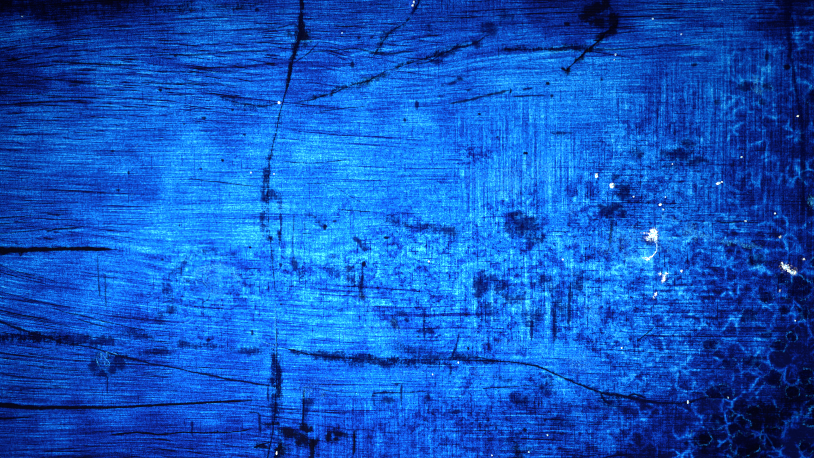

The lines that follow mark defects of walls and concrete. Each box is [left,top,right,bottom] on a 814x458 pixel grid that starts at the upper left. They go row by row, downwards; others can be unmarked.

crack [267,0,302,197]
crack [561,22,617,71]
crack [0,223,354,458]
crack [392,357,708,404]